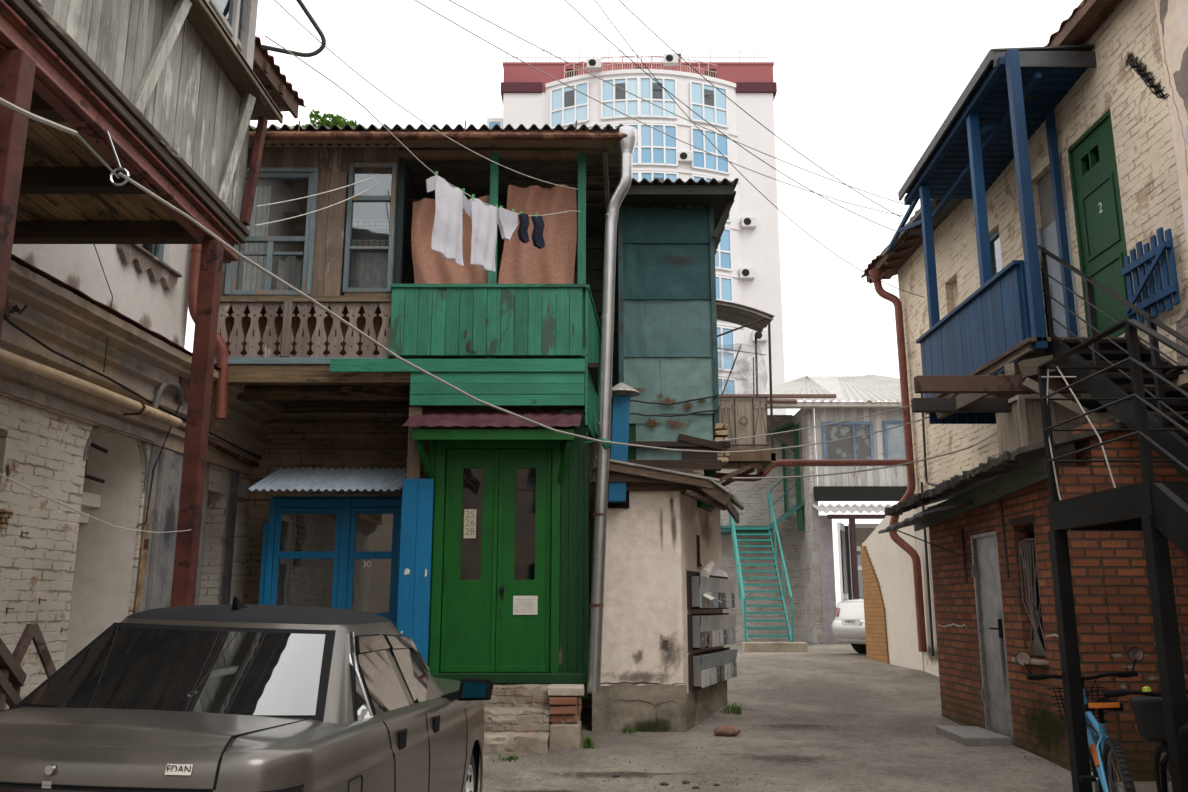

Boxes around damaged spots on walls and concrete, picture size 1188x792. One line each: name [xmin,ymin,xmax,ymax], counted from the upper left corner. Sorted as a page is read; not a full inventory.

peeling [1173,46,1188,148]
leakage [621,638,679,682]